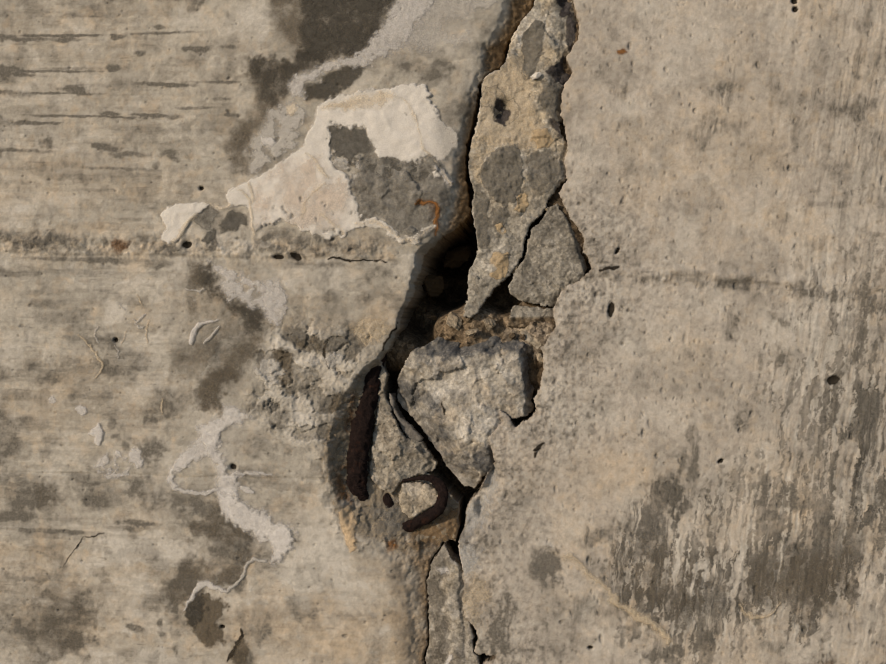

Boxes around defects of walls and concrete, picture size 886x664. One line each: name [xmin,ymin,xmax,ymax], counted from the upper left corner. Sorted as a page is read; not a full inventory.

peeling [160,83,457,245]
water stain [225,0,497,174]
crack [485,0,535,71]
crack [563,0,579,75]
water stain [167,264,294,611]
spalling [254,337,343,386]
spalling [352,319,388,345]
spalling [326,364,459,552]
crack [382,93,619,615]
water stain [841,377,886,508]
water stain [614,477,881,647]